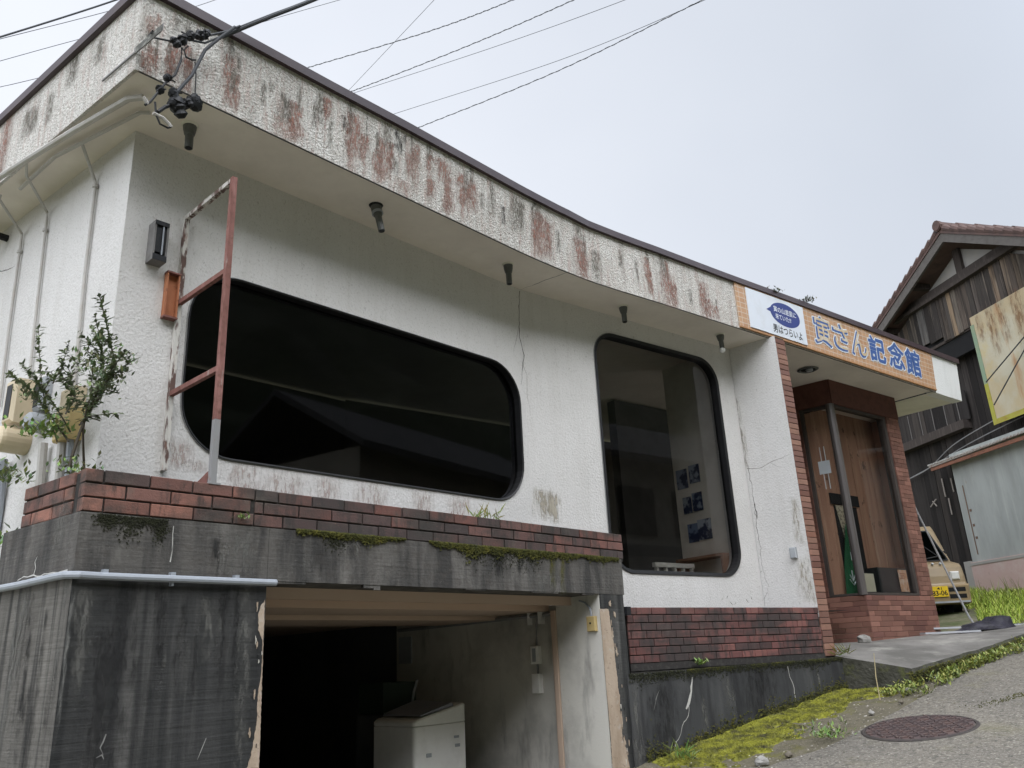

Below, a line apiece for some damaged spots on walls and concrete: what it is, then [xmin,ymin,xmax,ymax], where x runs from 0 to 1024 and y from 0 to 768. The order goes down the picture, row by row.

corrosion [141,15,193,89]
corrosion [223,40,241,108]
corrosion [280,84,304,137]
corrosion [347,104,476,213]
corrosion [531,202,552,257]
corrosion [574,226,587,276]
corrosion [644,251,677,303]
corrosion [699,283,718,318]
water stain [536,491,559,521]
crack [739,425,790,596]
peeling [247,600,265,768]